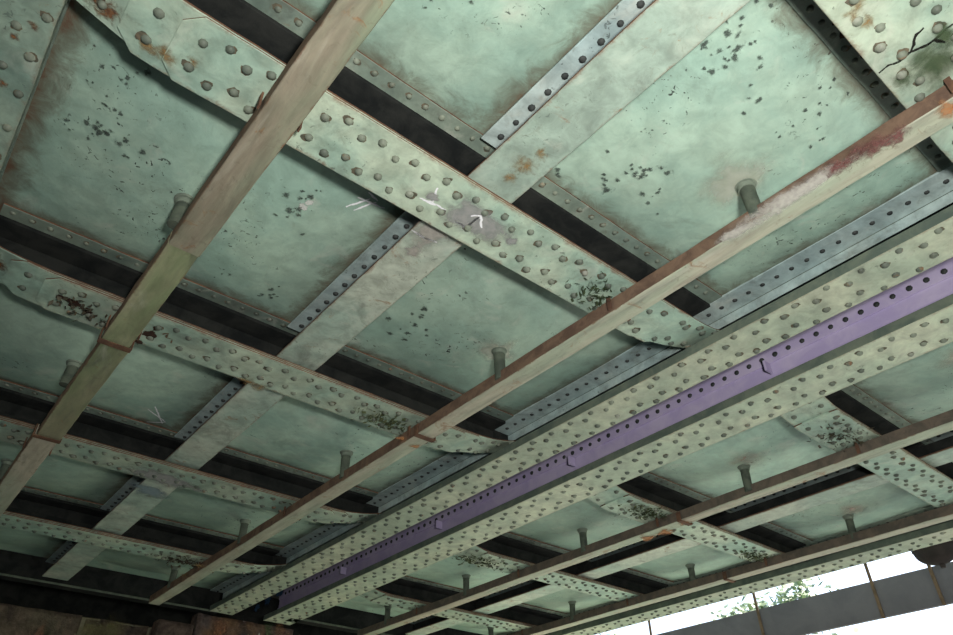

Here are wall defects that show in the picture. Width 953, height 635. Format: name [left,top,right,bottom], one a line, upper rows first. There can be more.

corrosion [84,0,119,19]
corrosion [141,42,173,62]
crack [879,24,953,74]
peeling [406,222,449,256]
peeling [446,199,517,245]
corrosion [56,294,93,315]